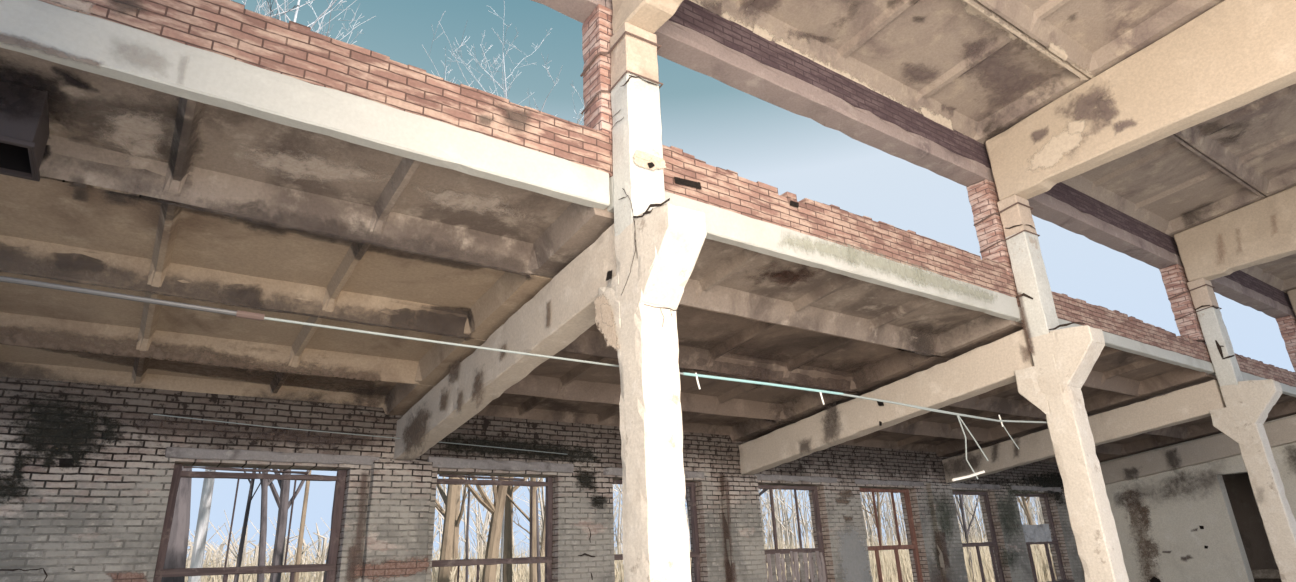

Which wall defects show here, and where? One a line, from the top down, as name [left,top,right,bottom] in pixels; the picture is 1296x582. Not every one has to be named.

leakage [53,67,196,181]
leakage [966,45,1048,139]
leakage [1033,129,1047,142]
spalling [1029,119,1085,171]
leakage [1065,90,1136,132]
crack [618,188,678,327]
spalling [594,294,620,351]
leakage [0,327,390,411]
leakage [0,362,122,504]
leakage [1119,468,1158,582]
crack [0,568,76,582]
flaking render [353,555,430,582]